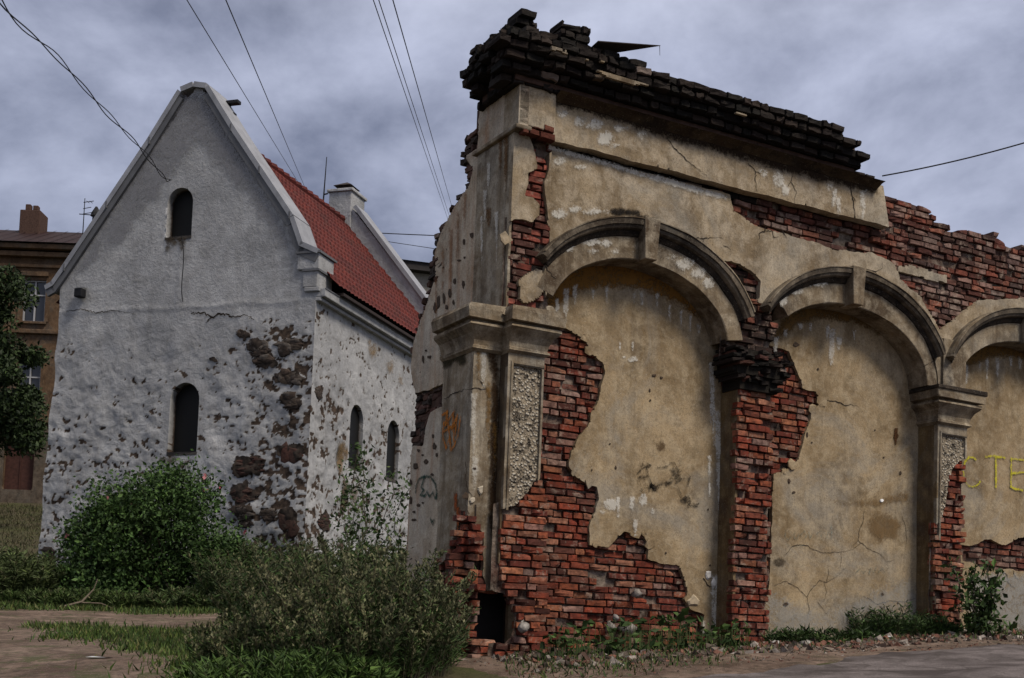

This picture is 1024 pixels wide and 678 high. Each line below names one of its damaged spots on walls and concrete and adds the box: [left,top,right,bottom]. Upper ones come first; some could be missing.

crack [191,312,254,322]
spalling [236,329,305,410]
spalling [499,137,556,315]
spalling [718,189,1024,329]
spalling [227,441,305,538]
spalling [435,329,712,658]
spalling [706,262,827,642]
crack [779,513,907,614]
spalling [927,460,1024,627]